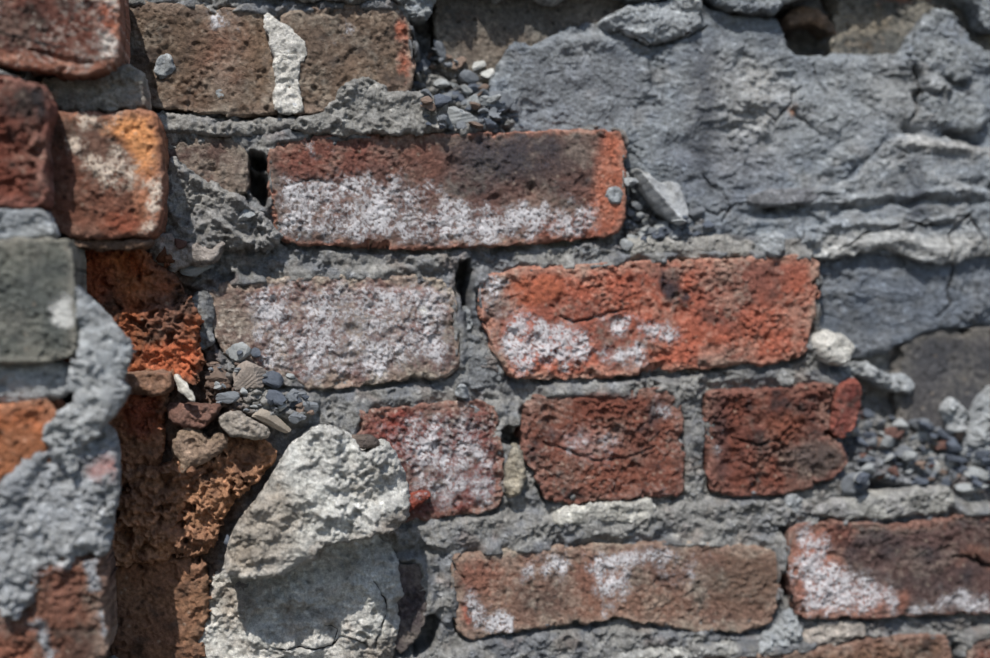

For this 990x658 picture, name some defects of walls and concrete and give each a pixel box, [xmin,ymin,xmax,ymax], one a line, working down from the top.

crack [765,64,826,130]
crack [910,64,943,119]
efflorescence [281,174,595,249]
crack [701,175,744,221]
efflorescence [480,276,502,303]
crack [841,214,984,317]
efflorescence [247,287,448,379]
efflorescence [503,314,590,372]
efflorescence [602,316,676,365]
efflorescence [406,417,495,507]
efflorescence [790,527,898,618]
efflorescence [908,590,988,614]